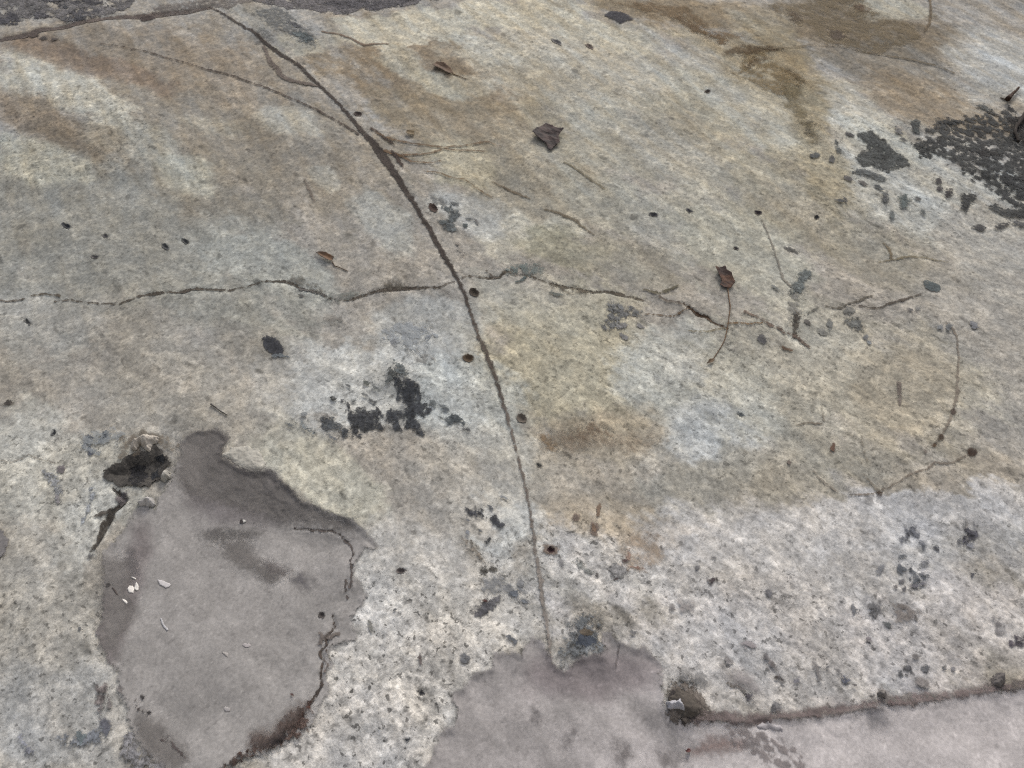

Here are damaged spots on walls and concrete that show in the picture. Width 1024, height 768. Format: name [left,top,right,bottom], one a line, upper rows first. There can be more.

water stain [810,103,1024,231]
crack [762,220,791,286]
crack [0,0,763,659]
water stain [464,495,531,617]
spalling [95,429,378,768]
crack [294,527,355,706]
water stain [557,613,605,667]
water stain [664,670,712,727]
water stain [812,661,857,686]
crack [690,667,1024,726]
water stain [898,654,960,688]
water stain [992,617,1024,647]